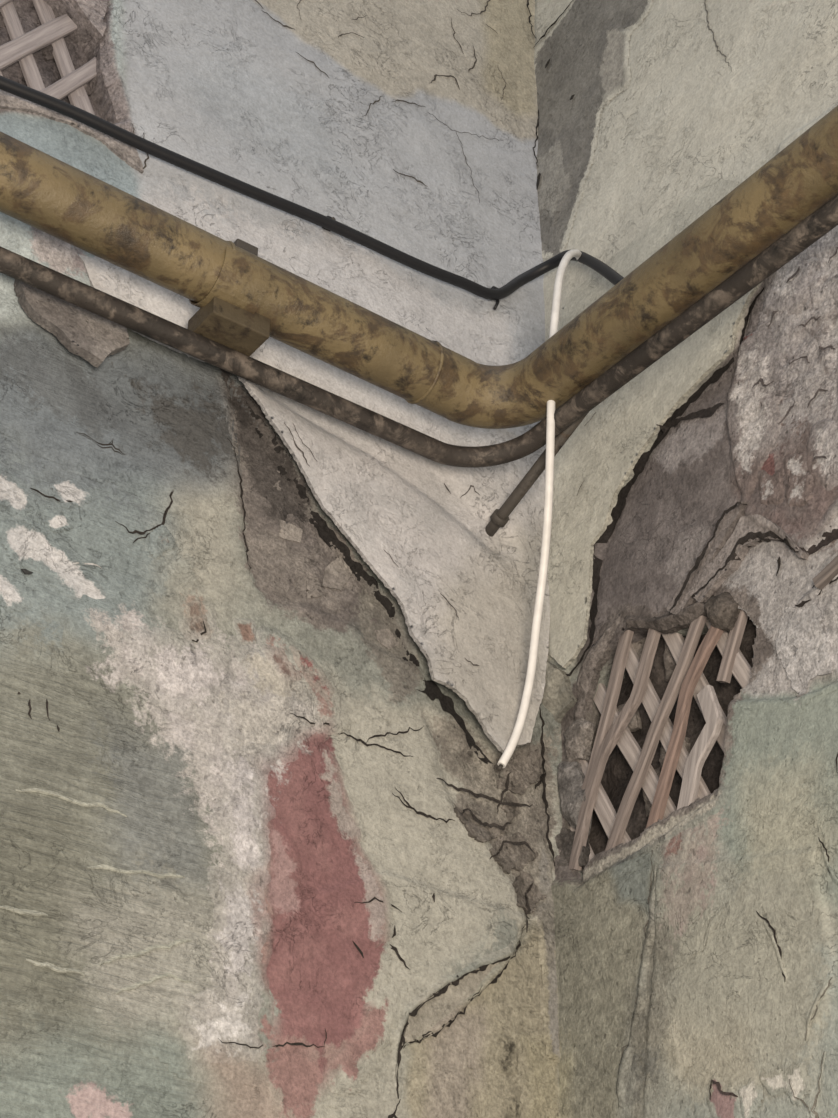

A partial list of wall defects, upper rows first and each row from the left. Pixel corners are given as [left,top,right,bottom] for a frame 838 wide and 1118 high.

spalling [0,0,144,174]
crack [255,0,329,78]
peeling [558,177,742,331]
crack [669,499,838,614]
peeling [0,225,838,1118]
crack [392,789,455,823]
crack [535,704,555,866]
crack [354,883,533,1118]